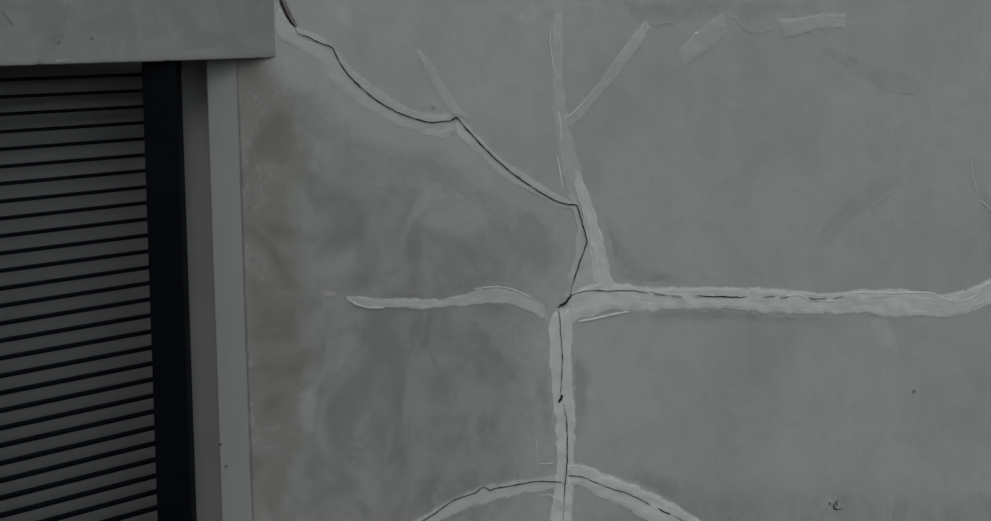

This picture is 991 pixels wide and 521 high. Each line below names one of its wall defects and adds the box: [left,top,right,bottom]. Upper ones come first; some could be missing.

crack [281,0,747,521]